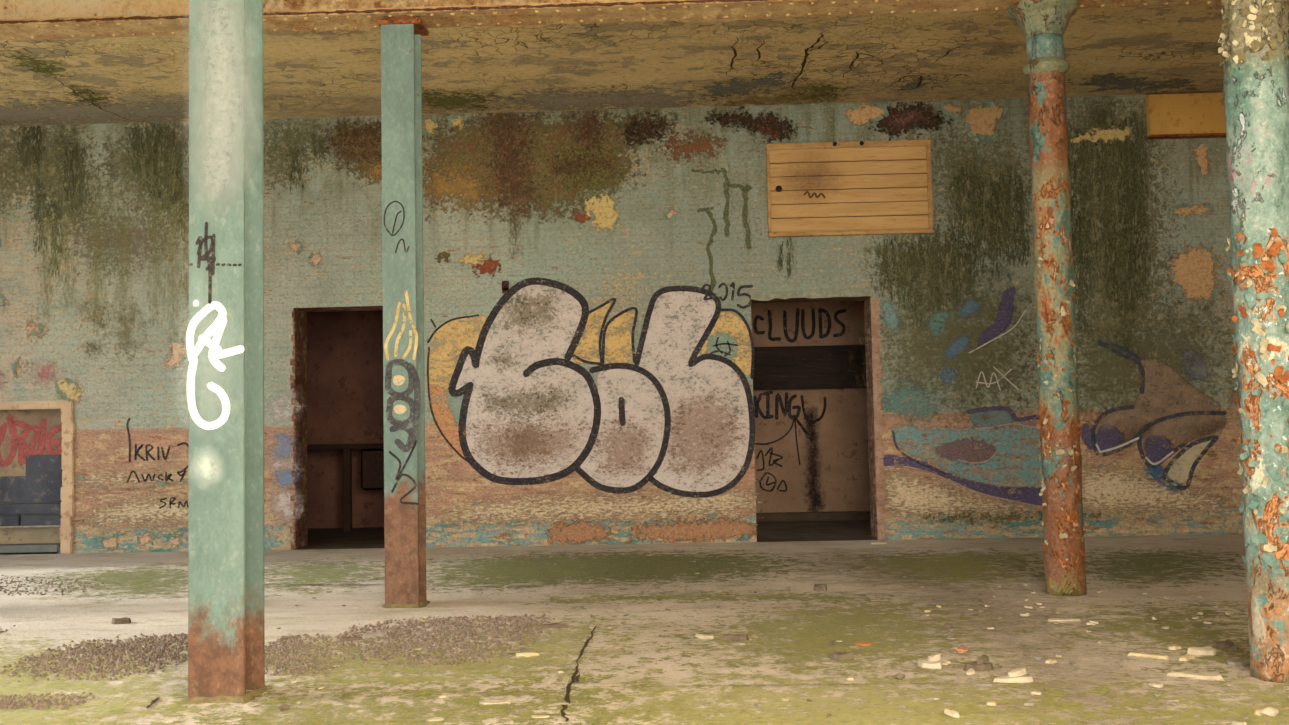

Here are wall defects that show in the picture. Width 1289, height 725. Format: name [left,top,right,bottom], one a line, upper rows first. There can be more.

crack [726,37,765,76]
crack [791,30,865,88]
crack [890,44,967,90]
peeling [1218,0,1289,66]
water stain [422,67,814,292]
peeling [1192,139,1212,178]
water stain [0,91,189,357]
water stain [874,161,1031,327]
peeling [1172,203,1214,218]
peeling [6,357,35,379]
crack [560,625,597,722]